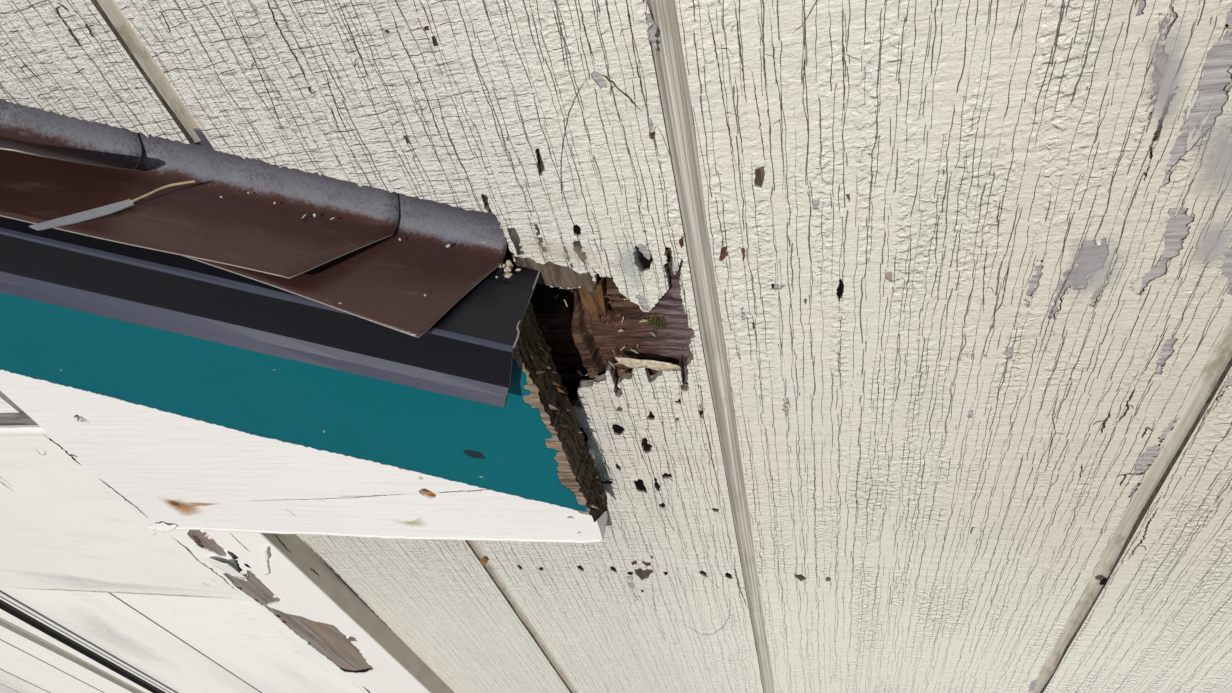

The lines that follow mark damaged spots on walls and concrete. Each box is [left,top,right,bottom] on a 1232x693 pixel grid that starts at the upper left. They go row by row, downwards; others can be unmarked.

crack [267,0,351,138]
crack [551,0,671,207]
crack [707,2,806,183]
crack [842,0,859,118]
peeling [1142,5,1232,184]
peeling [508,224,597,291]
crack [958,201,1011,362]
peeling [1048,237,1112,319]
peeling [1127,207,1194,294]
crack [1093,326,1169,438]
peeling [188,530,373,673]
peeling [626,556,653,592]